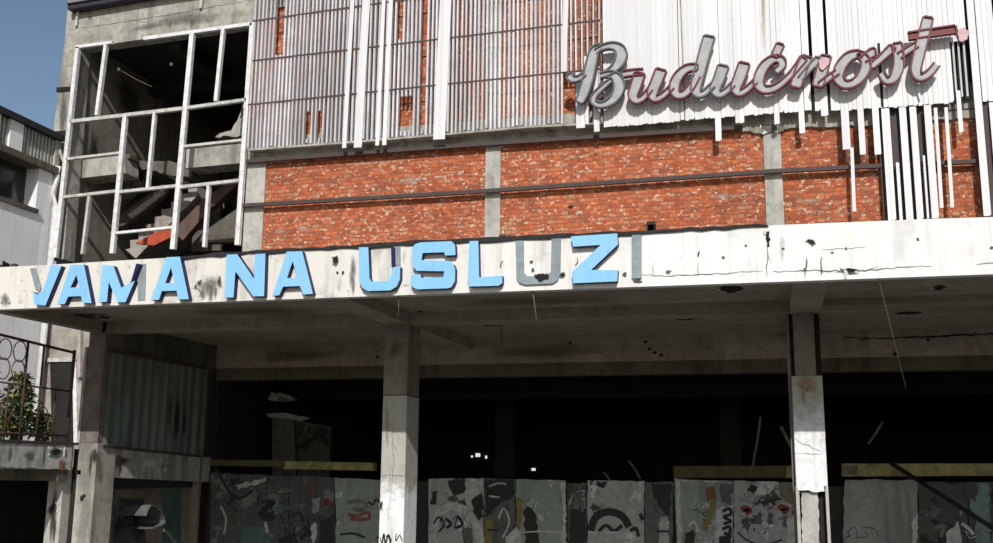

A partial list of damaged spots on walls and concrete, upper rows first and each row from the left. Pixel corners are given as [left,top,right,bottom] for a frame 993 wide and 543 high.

crack [642,247,930,278]
leakage [195,277,221,299]
crack [844,333,993,341]